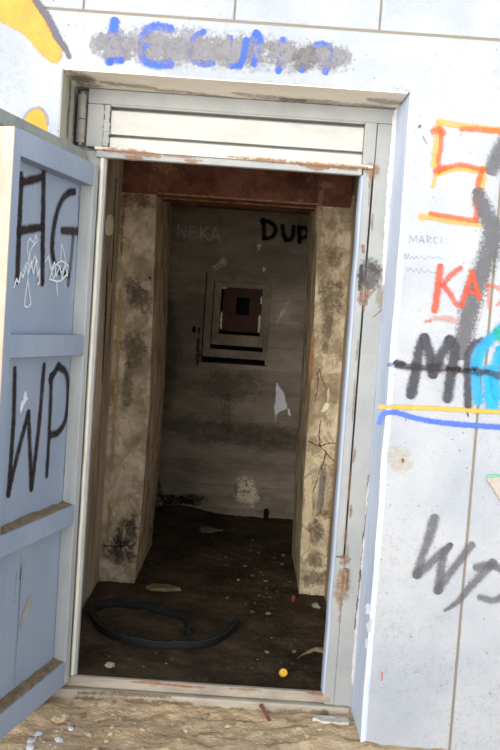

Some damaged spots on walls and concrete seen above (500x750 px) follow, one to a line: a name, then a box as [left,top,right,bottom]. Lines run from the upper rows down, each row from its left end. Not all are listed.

rust [228,156,379,177]
leakage [358,263,379,291]
peeling [274,383,291,416]
crack [314,369,328,402]
crack [308,421,336,491]
spalling [233,476,260,508]
mould [102,511,138,564]
rust [334,555,351,601]